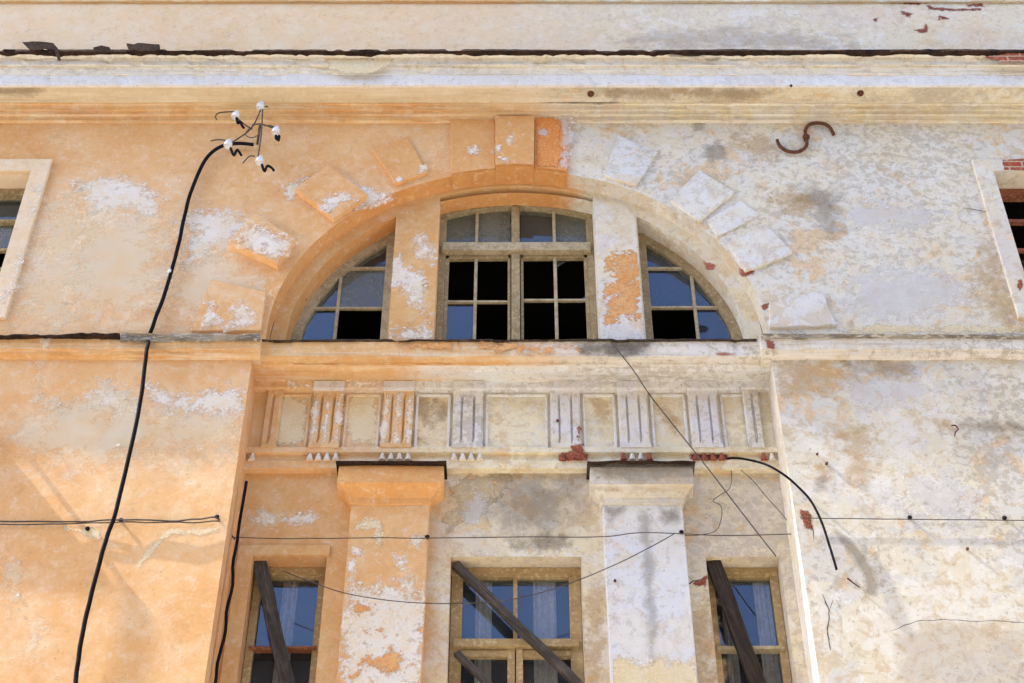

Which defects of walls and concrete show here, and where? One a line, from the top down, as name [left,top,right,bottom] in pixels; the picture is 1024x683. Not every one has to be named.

flaking render [985,53,1024,63]
flaking render [1003,158,1024,170]
peeling [70,175,168,217]
peeling [389,234,438,340]
peeling [602,247,643,325]
peeling [9,380,246,478]
flaking render [558,427,588,460]
peeling [251,509,316,526]
peeling [354,517,384,545]
flaking render [800,510,813,530]
peeling [339,546,425,683]